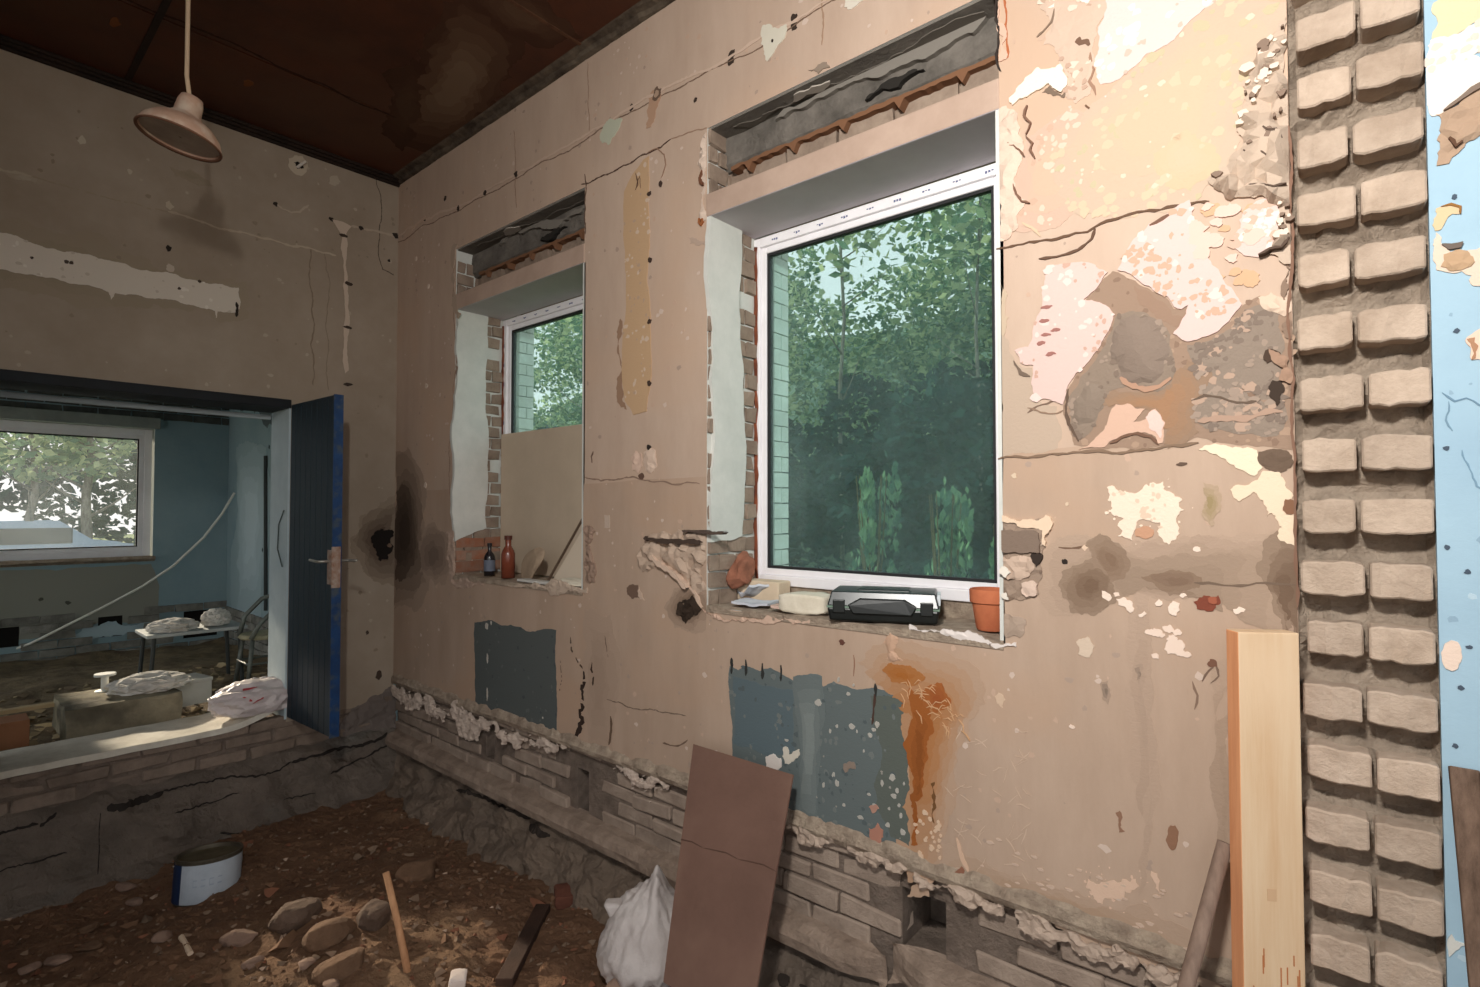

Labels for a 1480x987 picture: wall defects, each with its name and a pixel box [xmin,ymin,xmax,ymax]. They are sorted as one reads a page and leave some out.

rust [731,54,999,175]
spalling [775,3,1008,122]
crack [996,105,1209,260]
flaking render [999,0,1298,545]
peeling [1423,0,1480,166]
peeling [1432,206,1480,286]
crack [0,732,387,872]
flaking render [391,674,690,802]
crack [559,637,687,747]
peeling [765,739,800,770]
rust [857,638,986,898]
flaking render [785,721,1232,987]